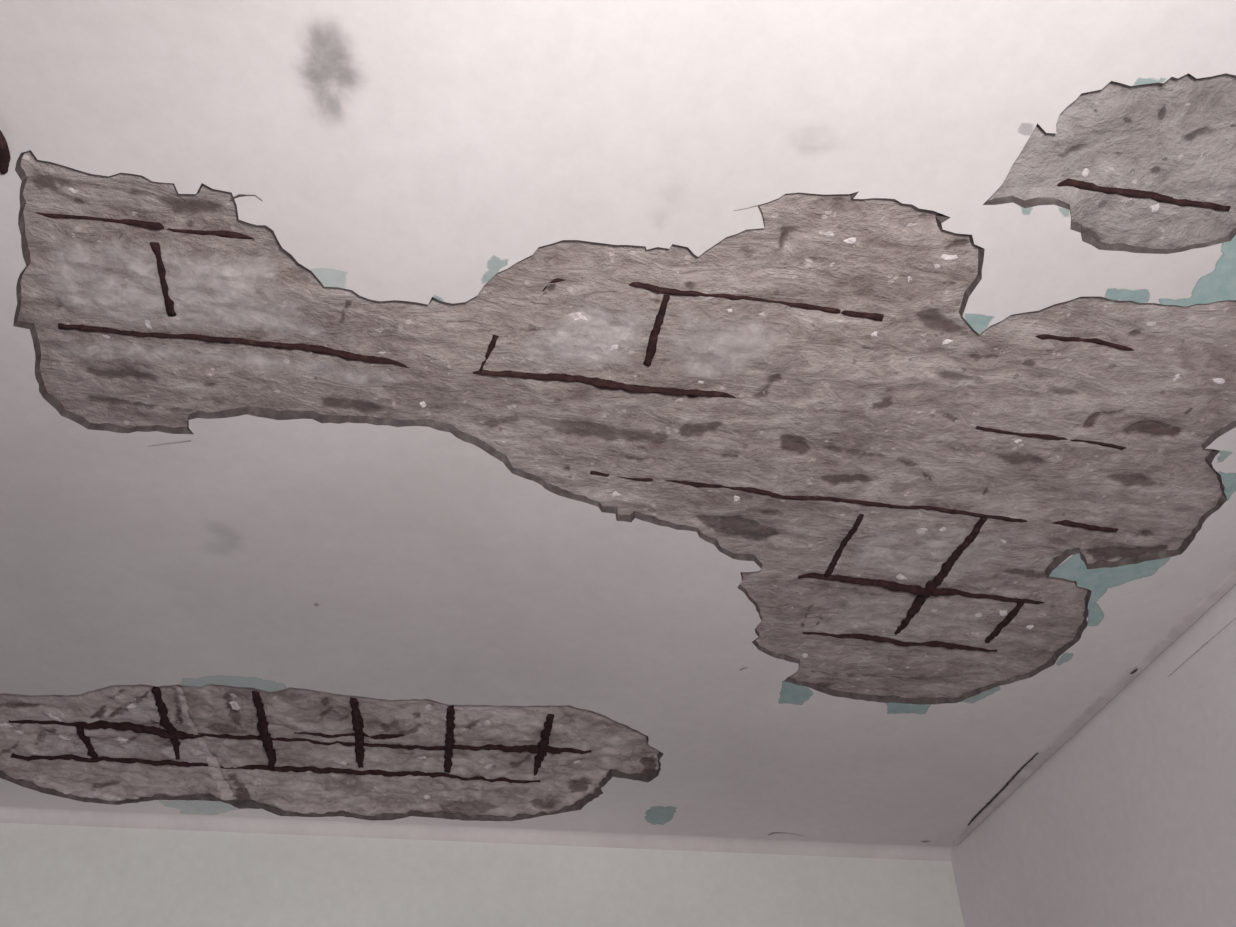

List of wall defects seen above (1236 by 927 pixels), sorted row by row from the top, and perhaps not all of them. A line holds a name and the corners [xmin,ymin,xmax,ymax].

spalling [13,73,1236,714]
spalling [0,675,663,821]